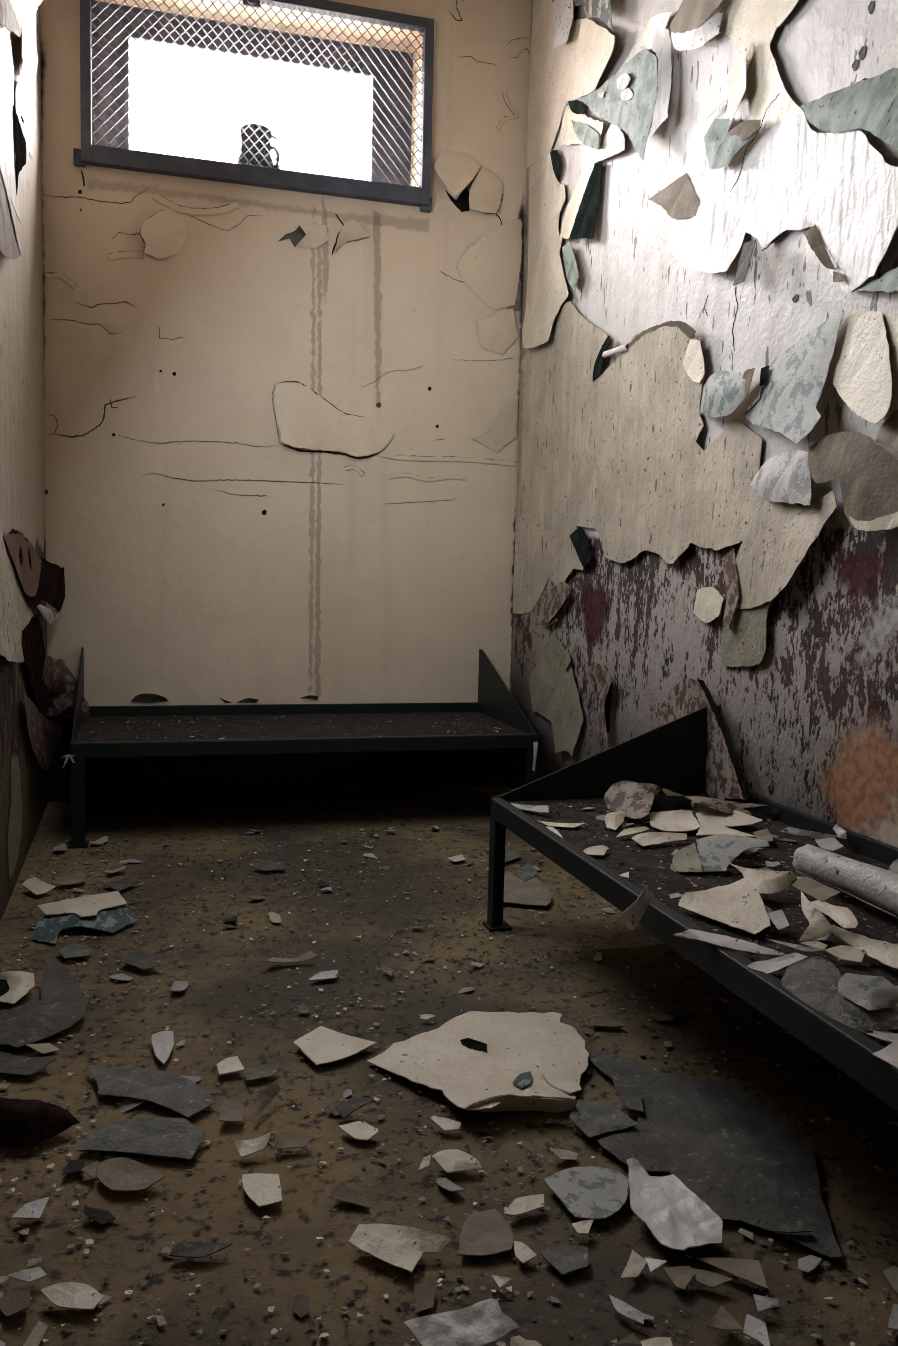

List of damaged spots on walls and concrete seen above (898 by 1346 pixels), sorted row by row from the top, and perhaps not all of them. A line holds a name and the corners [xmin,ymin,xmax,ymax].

peeling [0,0,43,259]
crack [42,171,255,231]
crack [45,272,135,334]
peeling [434,0,898,756]
crack [48,396,517,504]
water stain [583,585,607,642]
water stain [839,551,898,674]
peeling [0,512,141,959]
peeling [11,1197,49,1219]
peeling [7,1267,47,1283]